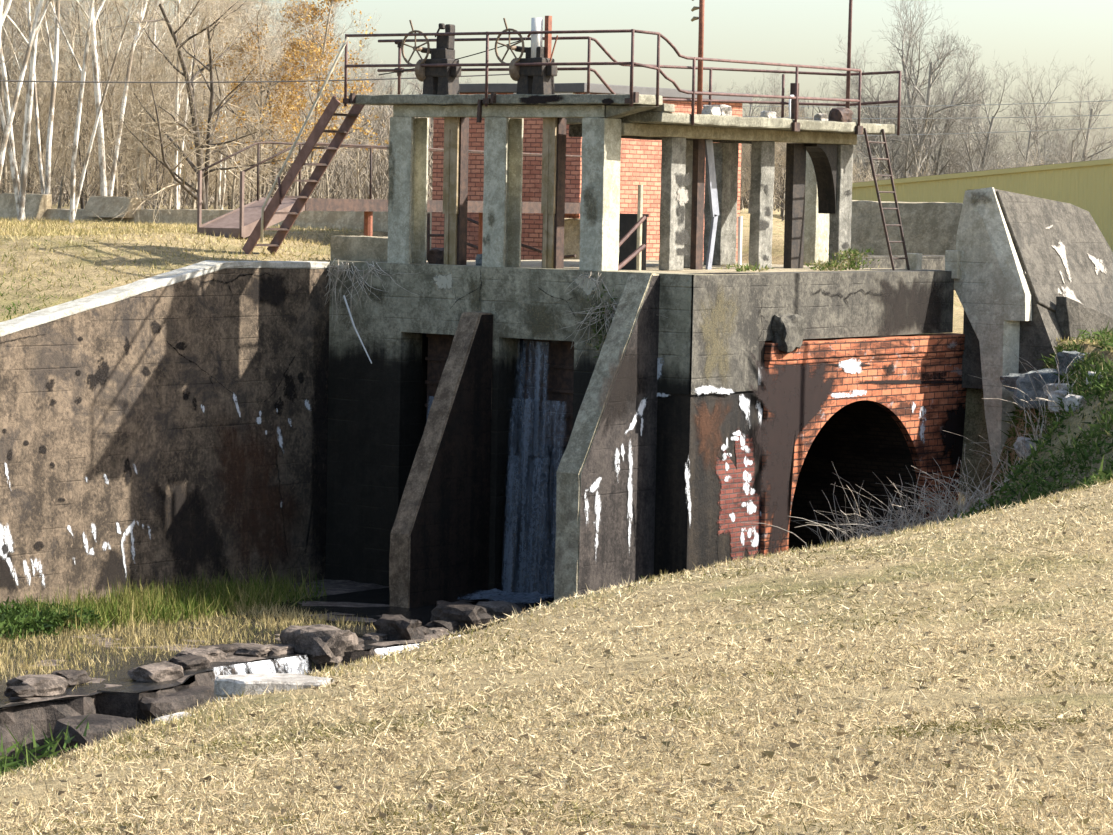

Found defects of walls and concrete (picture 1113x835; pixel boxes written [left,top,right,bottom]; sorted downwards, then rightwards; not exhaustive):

water stain [0,525,45,590]
water stain [67,478,233,592]
efflorescence [257,410,292,448]
efflorescence [585,478,601,548]
water stain [601,350,668,551]
peeling [714,429,761,561]